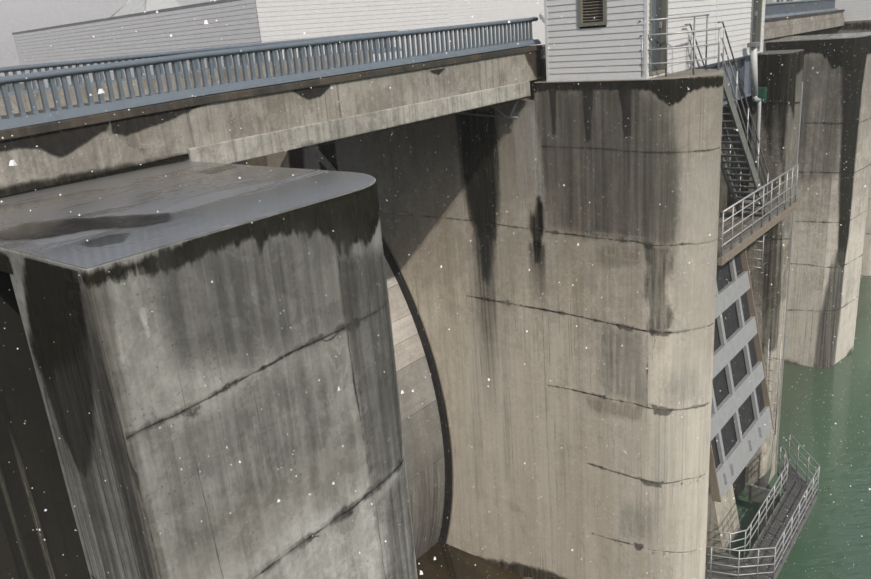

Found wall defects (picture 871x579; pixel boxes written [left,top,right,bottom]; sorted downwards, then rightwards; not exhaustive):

leakage [256,228,266,252]
leakage [457,108,499,322]
leakage [514,86,676,332]
leakage [814,50,867,368]
crack [475,297,689,374]
leakage [16,452,55,579]
leakage [45,346,153,579]
crack [126,311,377,490]
crack [309,460,403,540]
crack [561,387,706,415]
crack [591,464,685,487]